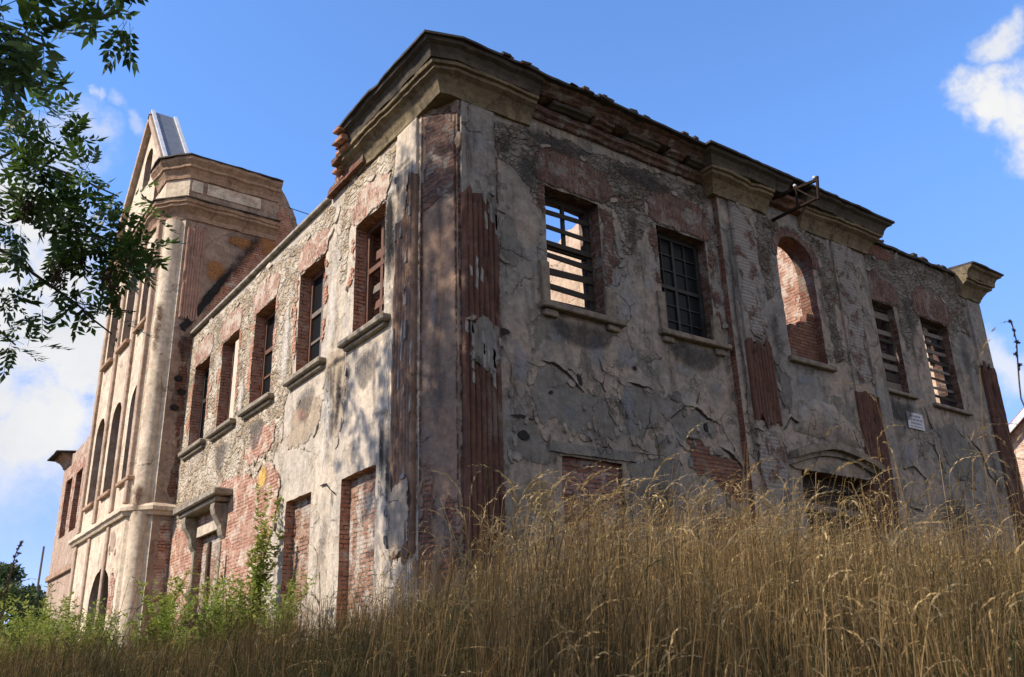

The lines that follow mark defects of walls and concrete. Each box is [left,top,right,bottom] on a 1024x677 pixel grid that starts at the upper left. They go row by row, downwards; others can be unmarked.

spalling [143,100,465,651]
peeling [469,256,484,289]
spalling [465,315,510,389]
crack [504,350,585,420]
spalling [730,202,846,364]
spalling [616,366,752,569]